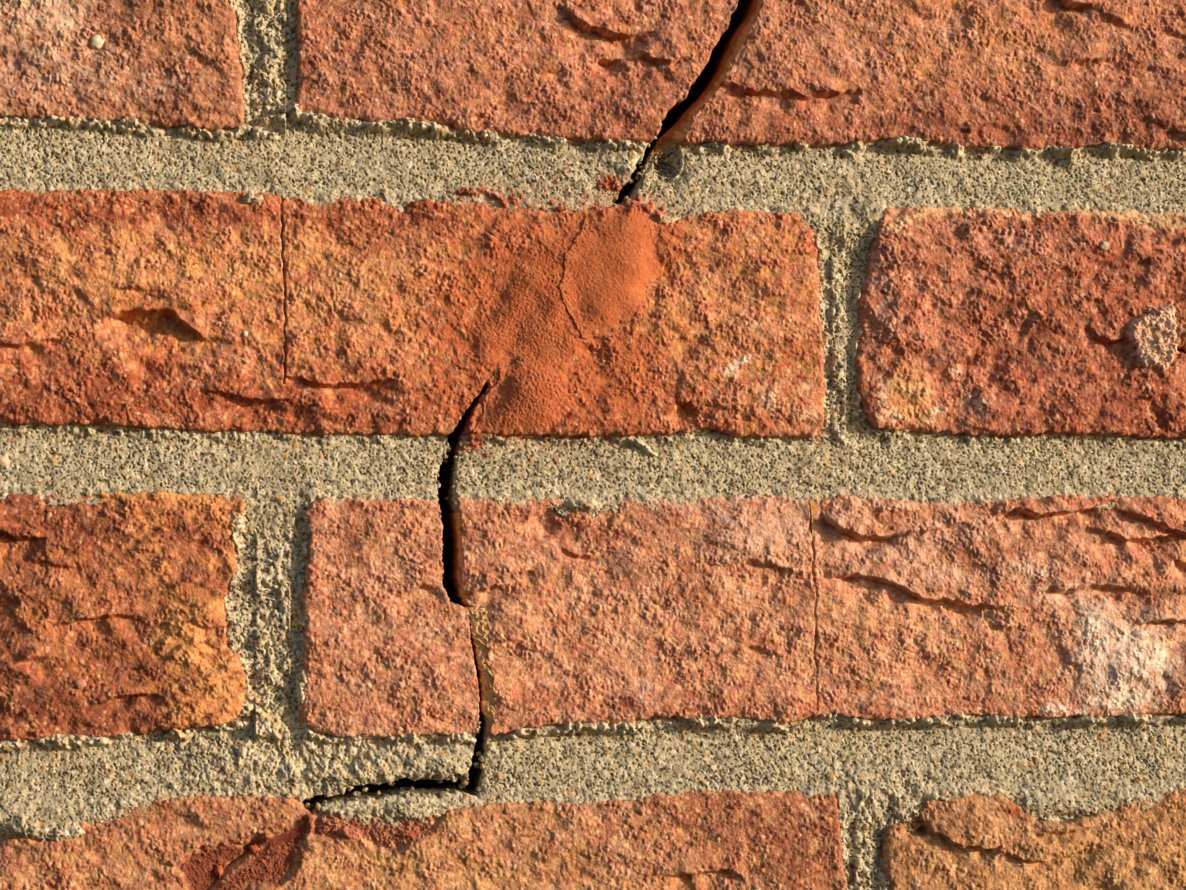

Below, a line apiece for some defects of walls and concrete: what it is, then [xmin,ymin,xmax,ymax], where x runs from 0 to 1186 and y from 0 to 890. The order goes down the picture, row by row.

crack [612,0,763,204]
crack [279,195,287,384]
crack [302,385,497,812]